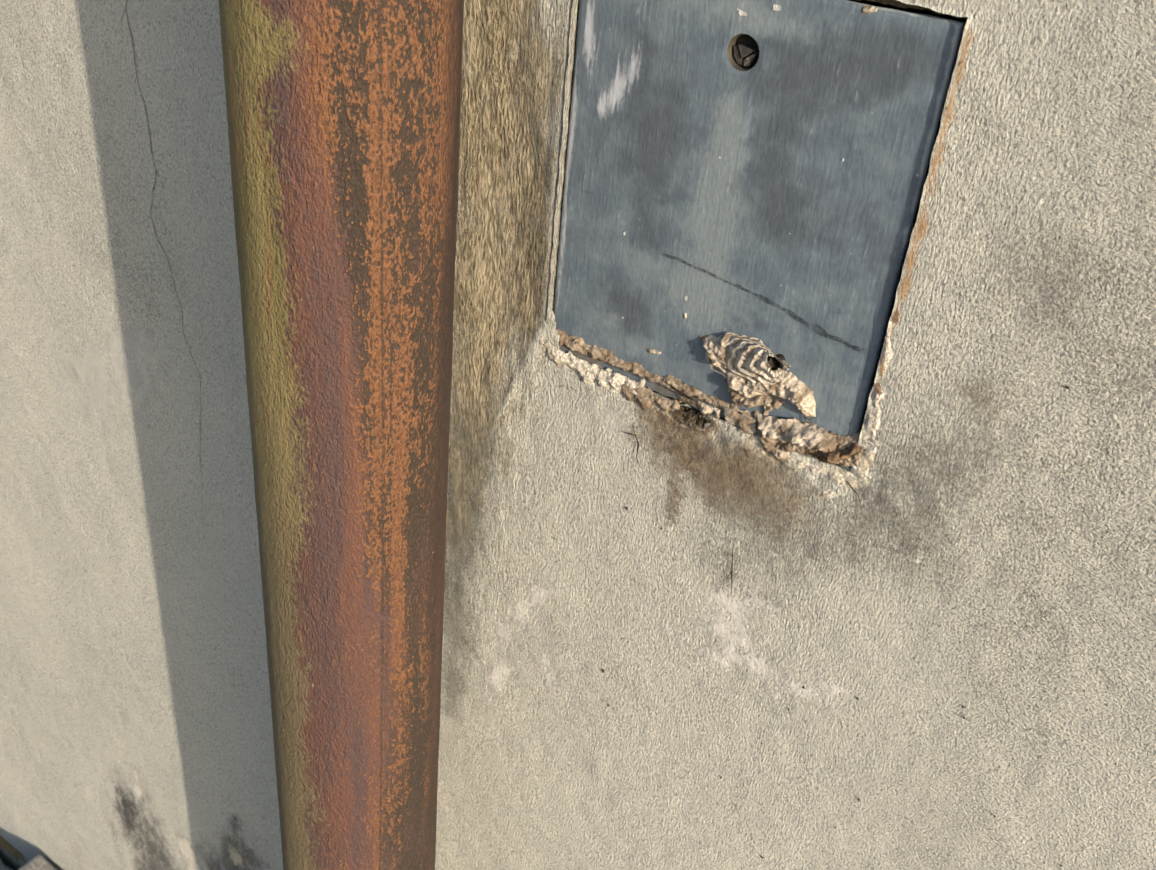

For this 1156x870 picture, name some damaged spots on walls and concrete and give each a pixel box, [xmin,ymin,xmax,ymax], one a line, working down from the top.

crack [121,0,204,538]
flaking render [645,315,893,500]
damp [637,571,852,706]
damp [117,766,258,870]